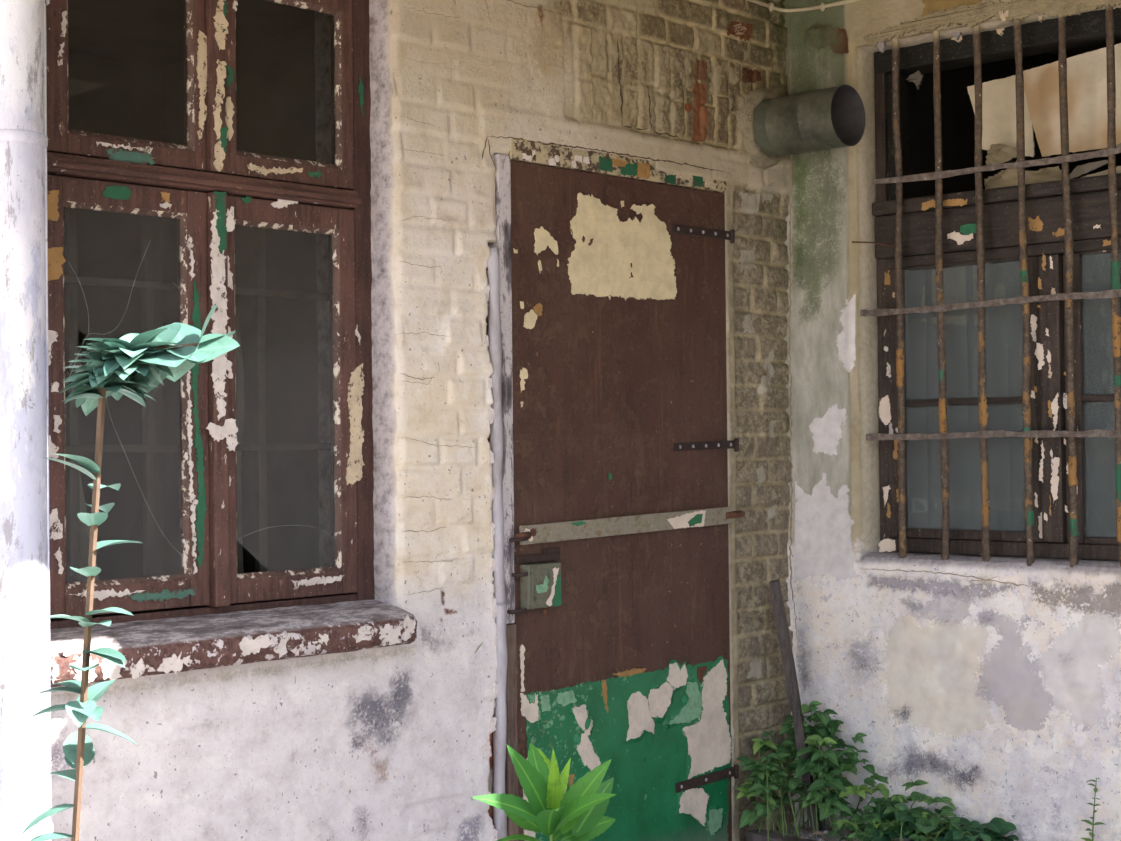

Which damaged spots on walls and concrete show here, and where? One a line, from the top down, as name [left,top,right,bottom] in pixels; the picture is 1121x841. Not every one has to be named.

spalling [805,23,849,54]
spalling [863,0,1121,53]
crack [482,39,729,174]
peeling [651,21,761,142]
peeling [835,294,856,372]
peeling [809,403,847,456]
peeling [794,471,859,580]
peeling [878,539,896,552]
peeling [882,485,898,518]
leakage [355,674,411,741]